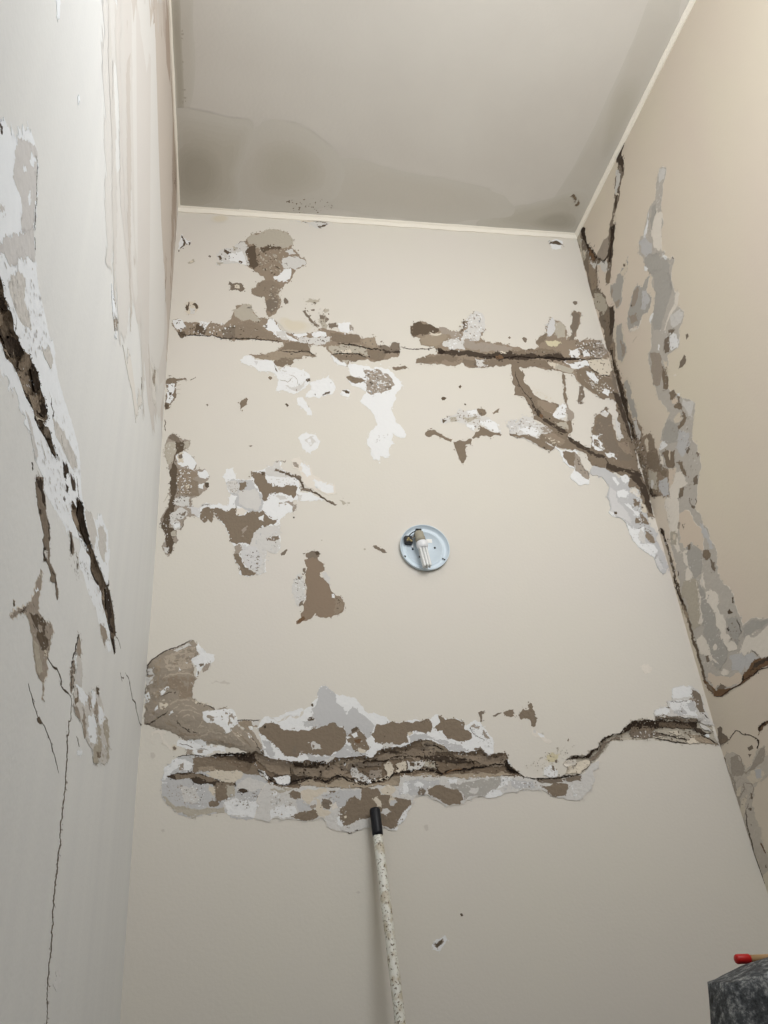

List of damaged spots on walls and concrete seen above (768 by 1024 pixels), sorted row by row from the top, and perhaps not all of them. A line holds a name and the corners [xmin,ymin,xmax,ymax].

peeling [9,569,55,702]
peeling [0,117,121,652]
crack [0,278,191,726]
peeling [292,540,346,625]
peeling [160,229,670,577]
crack [561,373,585,404]
crack [577,145,671,499]
crack [658,528,768,697]
crack [28,658,79,1024]
peeling [151,684,600,834]
crack [208,716,768,789]
peeling [654,685,768,884]